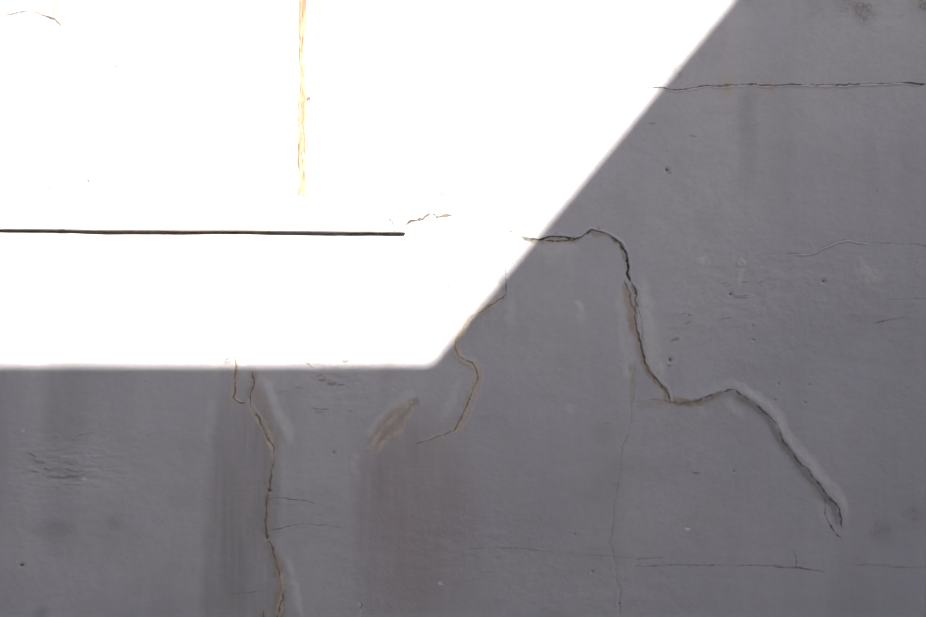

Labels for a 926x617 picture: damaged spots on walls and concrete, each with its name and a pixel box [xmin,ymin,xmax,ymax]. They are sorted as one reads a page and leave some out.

crack [406,82,924,96]
leakage [0,202,101,503]
leakage [179,257,304,617]
crack [224,205,275,451]
leakage [258,232,280,255]
crack [264,475,306,617]
leakage [348,219,580,617]
crack [370,187,842,537]